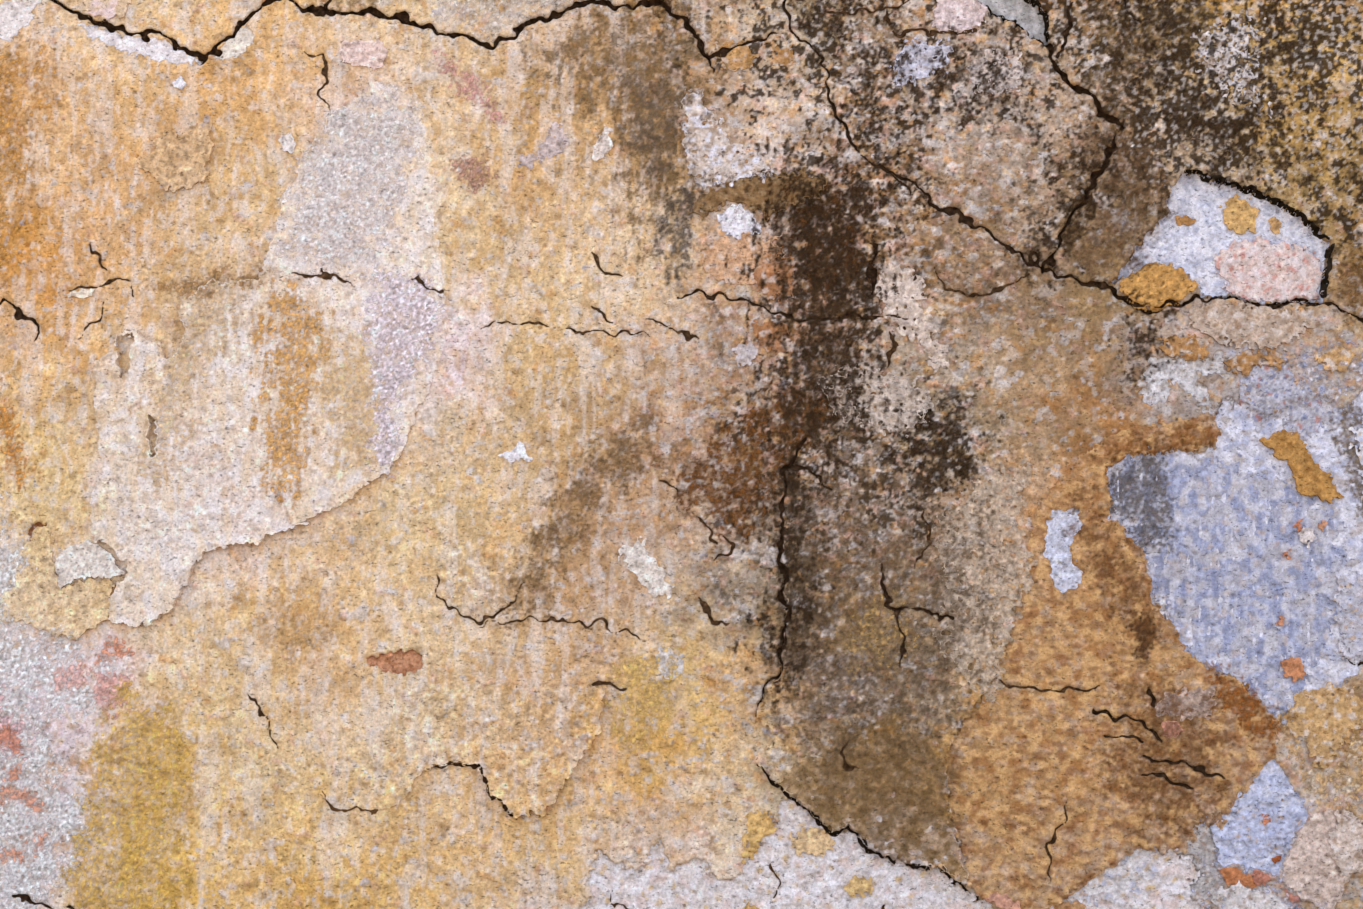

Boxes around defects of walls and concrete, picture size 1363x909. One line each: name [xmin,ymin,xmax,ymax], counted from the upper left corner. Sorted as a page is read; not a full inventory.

crack [0,298,40,341]
crack [63,244,134,339]
peeling [0,38,448,640]
crack [481,240,907,368]
crack [51,0,1363,322]
damp [506,163,998,782]
crack [756,437,832,714]
flaking render [580,351,1363,909]
damp [1060,0,1219,281]
spalling [1112,169,1335,312]